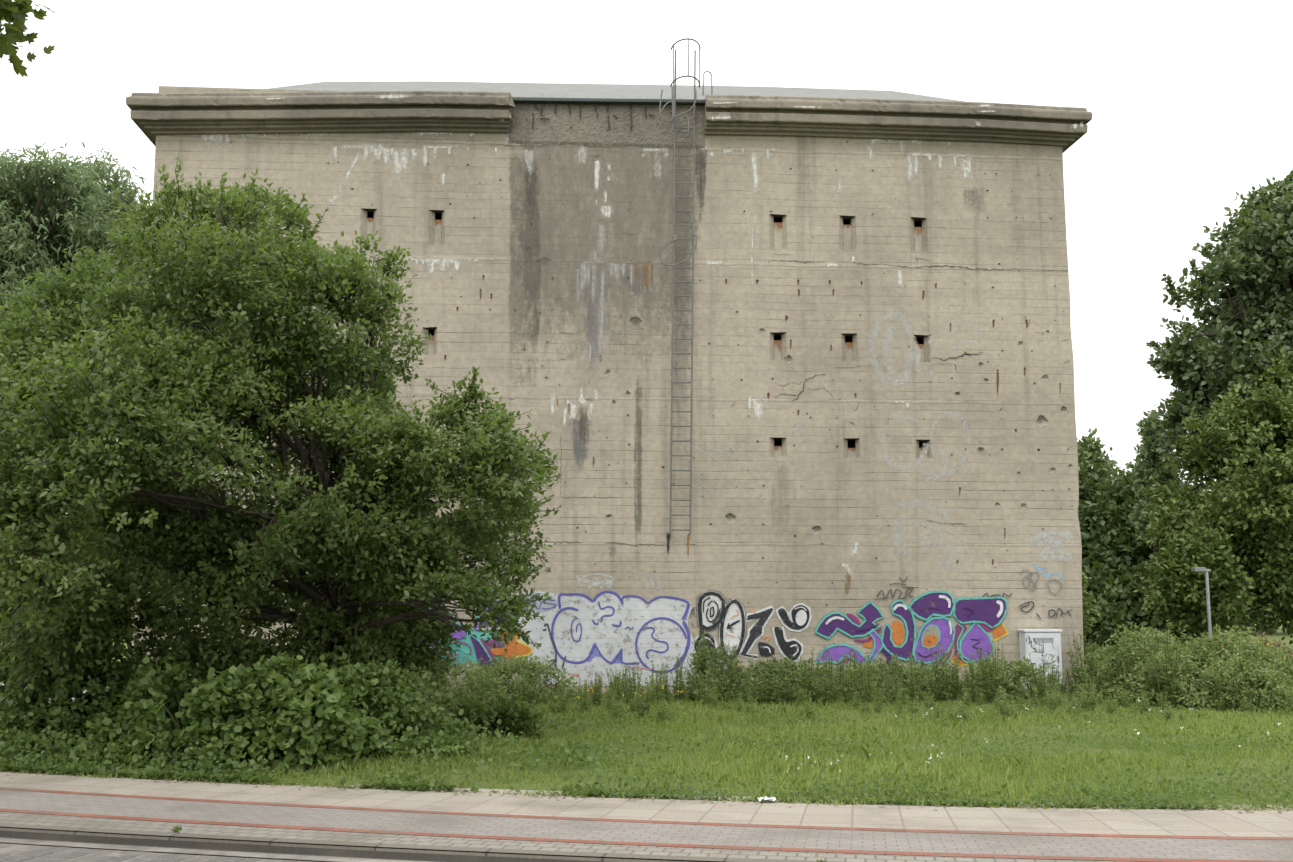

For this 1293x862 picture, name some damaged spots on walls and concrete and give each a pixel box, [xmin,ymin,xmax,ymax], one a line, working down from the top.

water stain [202,134,278,144]
water stain [295,132,473,203]
water stain [868,139,971,180]
water stain [525,144,775,360]
crack [935,351,983,372]
crack [775,365,868,423]
water stain [550,389,598,464]